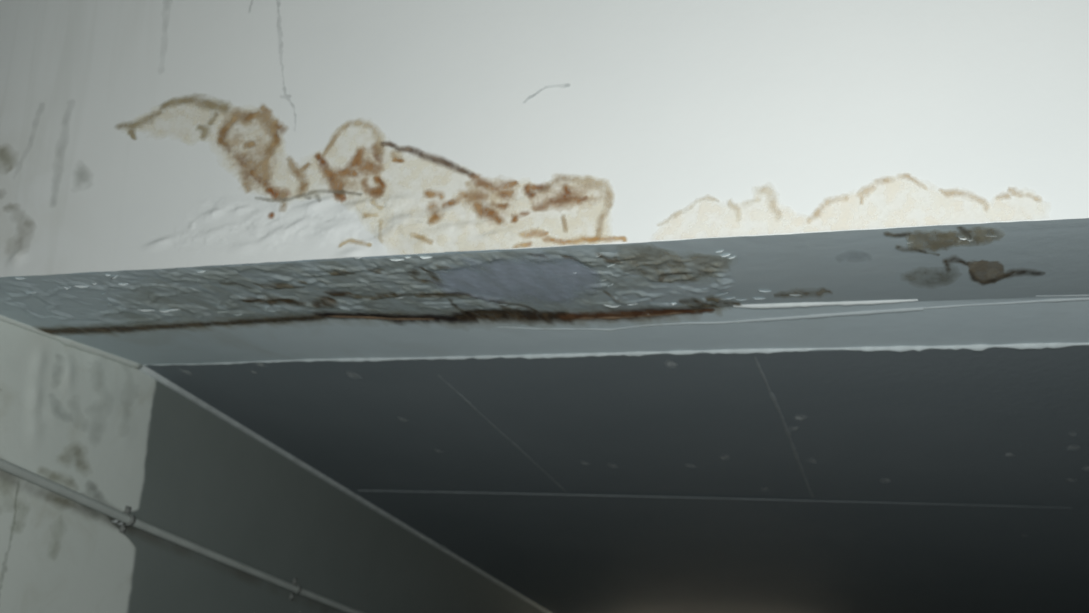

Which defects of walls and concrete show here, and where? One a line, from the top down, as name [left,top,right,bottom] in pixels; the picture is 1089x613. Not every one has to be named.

peeling [0,247,830,329]
peeling [885,227,1040,284]